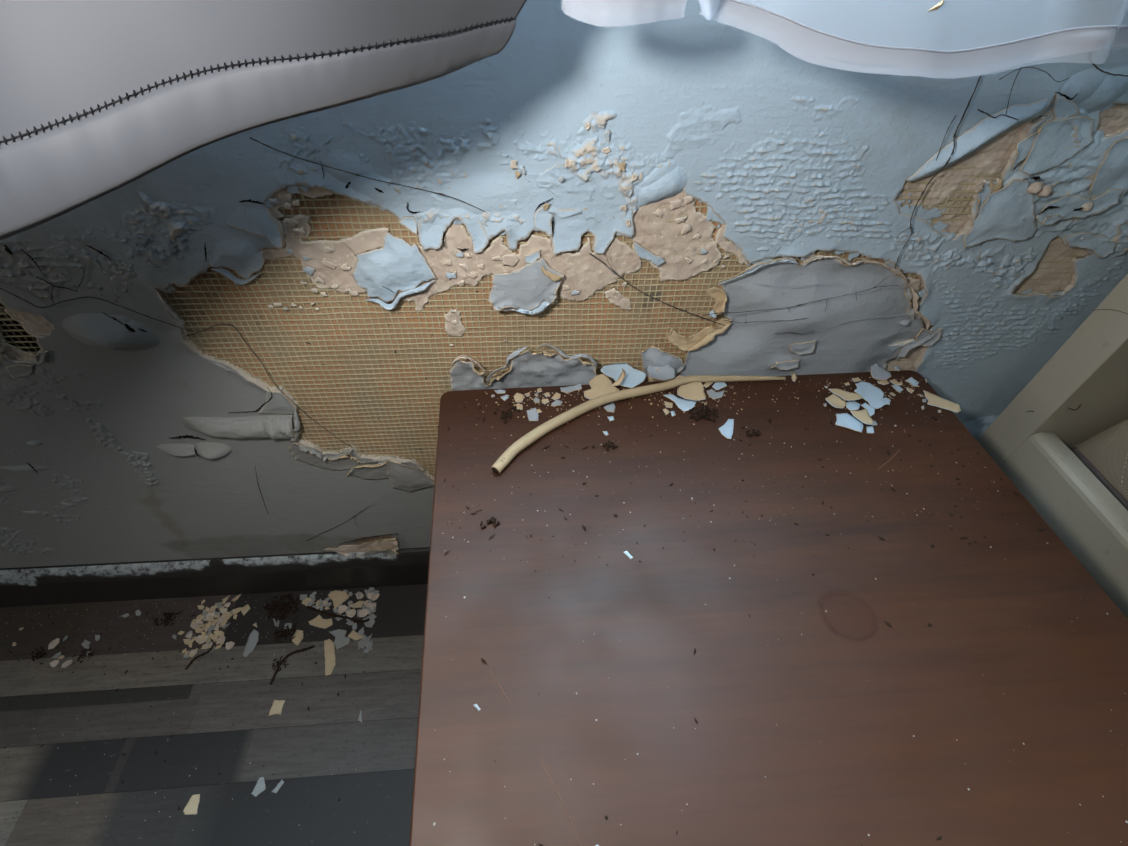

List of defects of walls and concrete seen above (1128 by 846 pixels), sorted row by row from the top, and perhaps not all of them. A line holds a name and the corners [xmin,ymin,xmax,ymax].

peeling [0,303,52,379]
crack [3,245,111,303]
peeling [156,160,961,492]
peeling [897,66,1128,294]